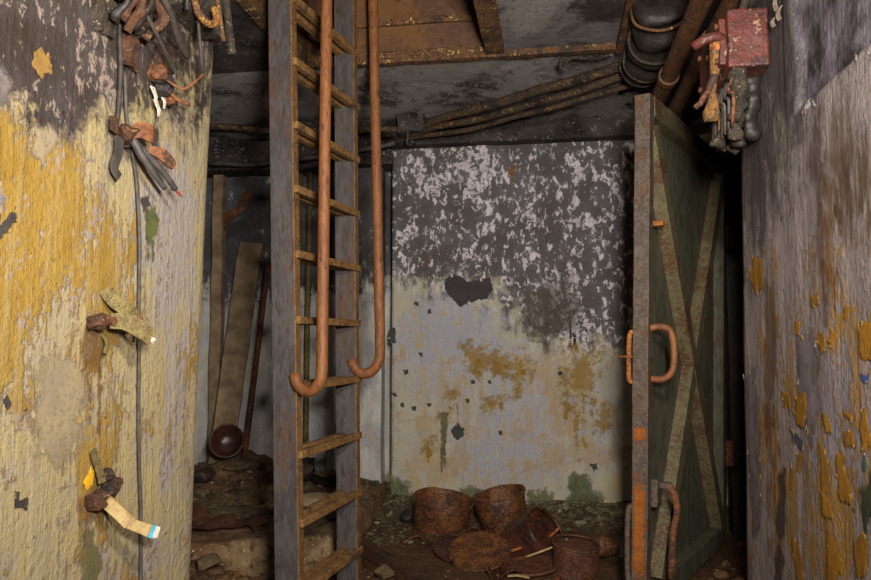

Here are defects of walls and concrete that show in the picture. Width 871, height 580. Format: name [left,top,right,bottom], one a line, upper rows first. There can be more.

peeling [31,47,52,79]
peeling [32,123,58,166]
spalling [0,181,18,239]
damp [395,224,415,261]
damp [520,197,539,270]
spalling [444,274,493,307]
damp [562,262,591,357]
spalling [451,423,464,440]
peeling [743,368,762,536]
peeling [782,320,871,580]
peeling [83,466,95,490]
spalling [15,491,29,511]